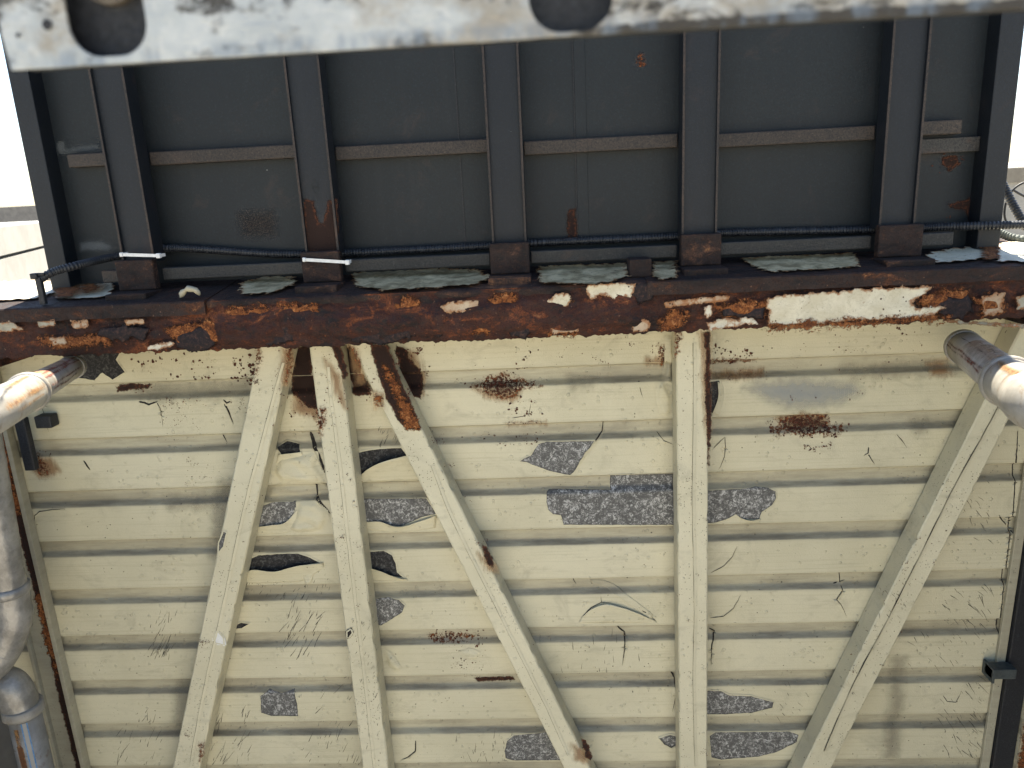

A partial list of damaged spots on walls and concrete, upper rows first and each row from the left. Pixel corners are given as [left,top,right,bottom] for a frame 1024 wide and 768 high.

corrosion [767,311,953,353]
corrosion [272,344,430,437]
corrosion [458,341,544,446]
corrosion [767,413,850,452]
peeling [359,446,418,483]
peeling [518,439,674,526]
peeling [707,484,778,524]
crack [994,432,1018,635]
peeling [246,552,324,584]
crack [824,407,1000,752]
corrosion [428,629,487,668]
peeling [707,689,775,716]